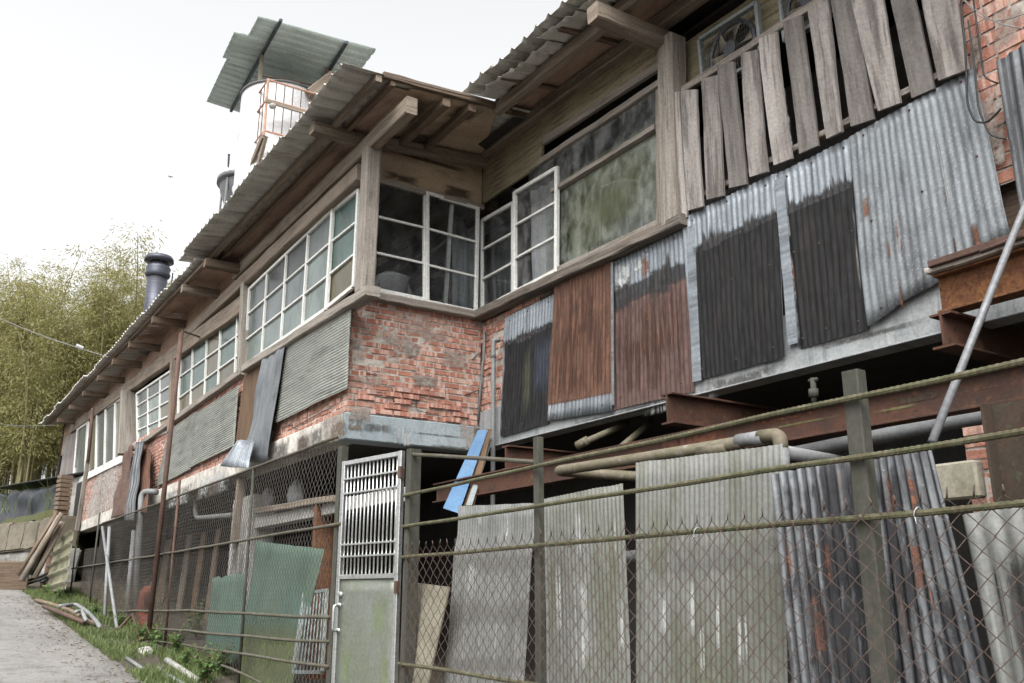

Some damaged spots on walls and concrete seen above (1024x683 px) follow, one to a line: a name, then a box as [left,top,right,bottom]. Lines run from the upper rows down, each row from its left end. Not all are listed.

corrosion [971,225,980,246]
corrosion [547,260,695,411]
corrosion [661,429,724,449]
corrosion [911,546,933,604]